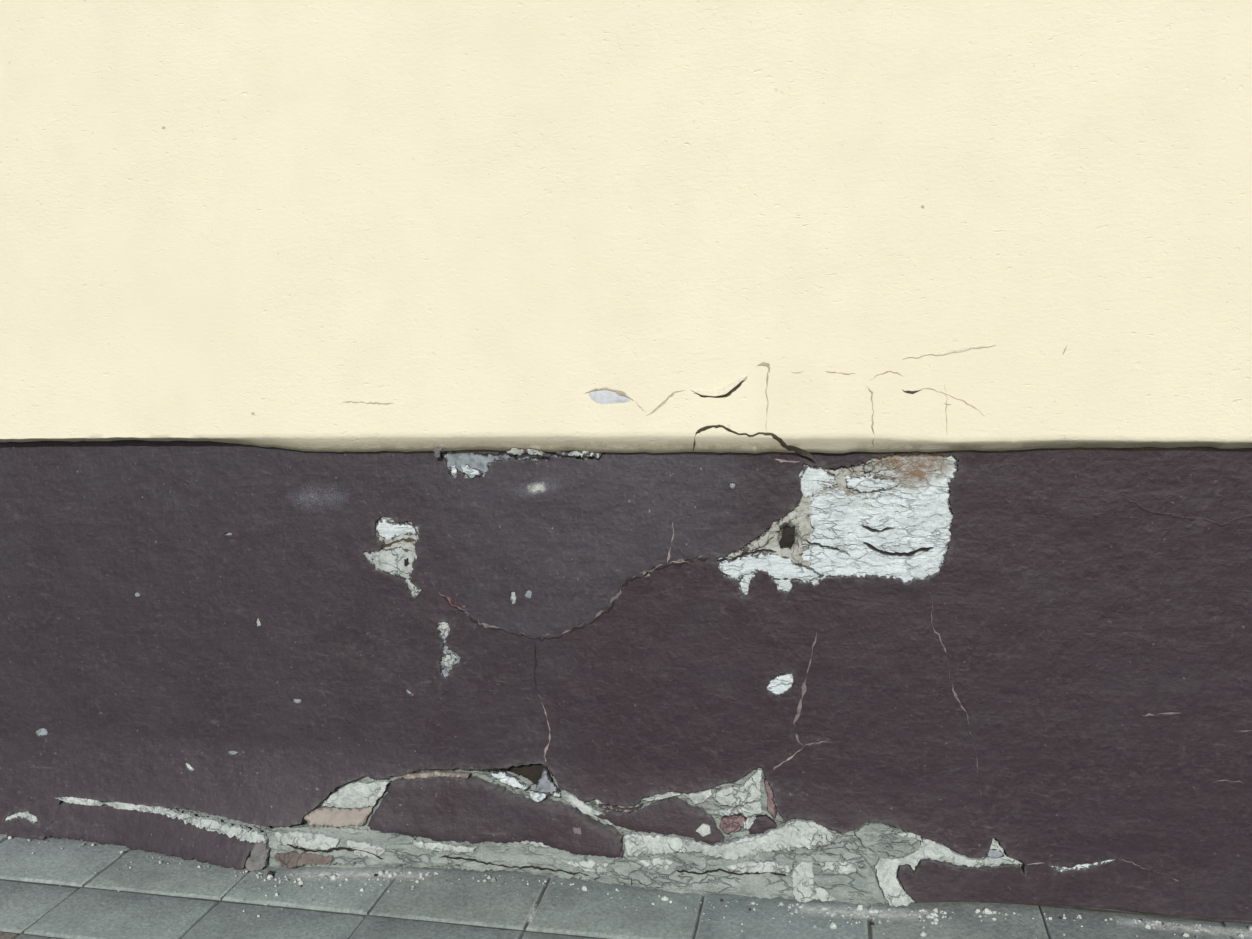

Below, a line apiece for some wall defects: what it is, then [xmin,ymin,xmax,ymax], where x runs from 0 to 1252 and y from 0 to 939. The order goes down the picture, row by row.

peeling [434,446,605,480]
crack [635,390,684,416]
crack [693,362,983,463]
peeling [363,516,421,597]
peeling [714,453,959,595]
peeling [437,622,461,678]
crack [439,522,725,845]
peeling [766,673,793,694]
crack [773,634,827,770]
spalling [168,764,1023,907]